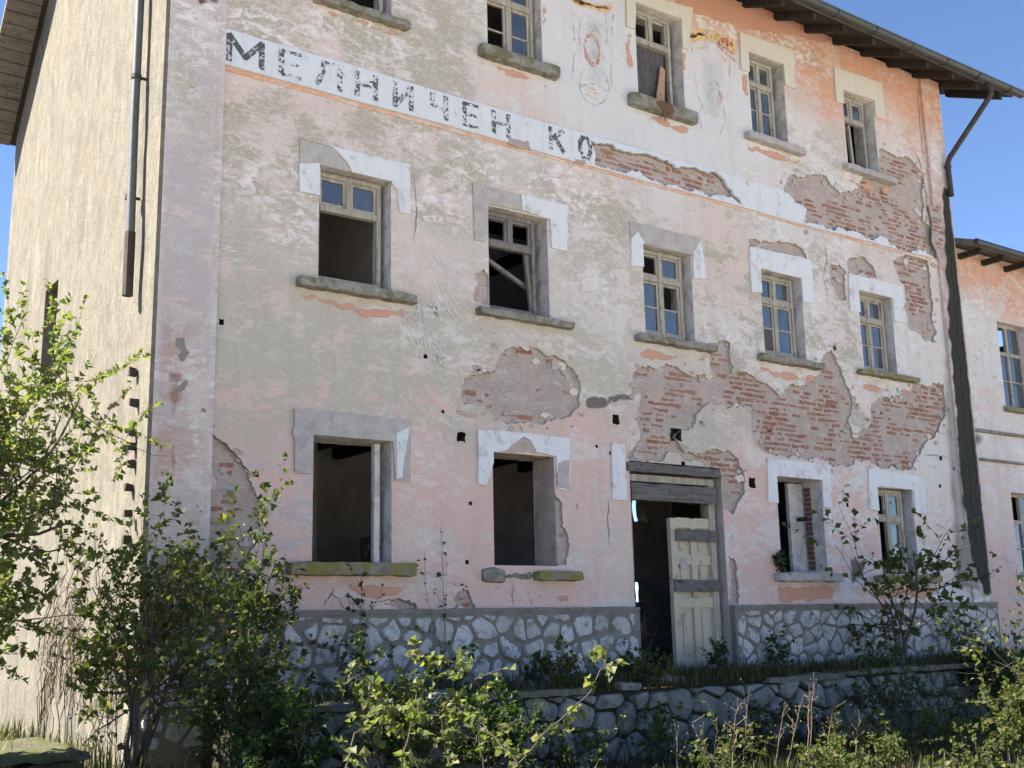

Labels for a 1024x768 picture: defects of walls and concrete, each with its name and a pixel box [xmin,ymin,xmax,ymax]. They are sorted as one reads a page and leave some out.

flaking render [573,144,738,202]
flaking render [748,143,950,343]
peeling [175,338,190,361]
peeling [304,295,456,378]
flaking render [441,343,584,431]
flaking render [627,340,950,514]
flaking render [151,435,263,610]
flaking render [555,460,570,565]